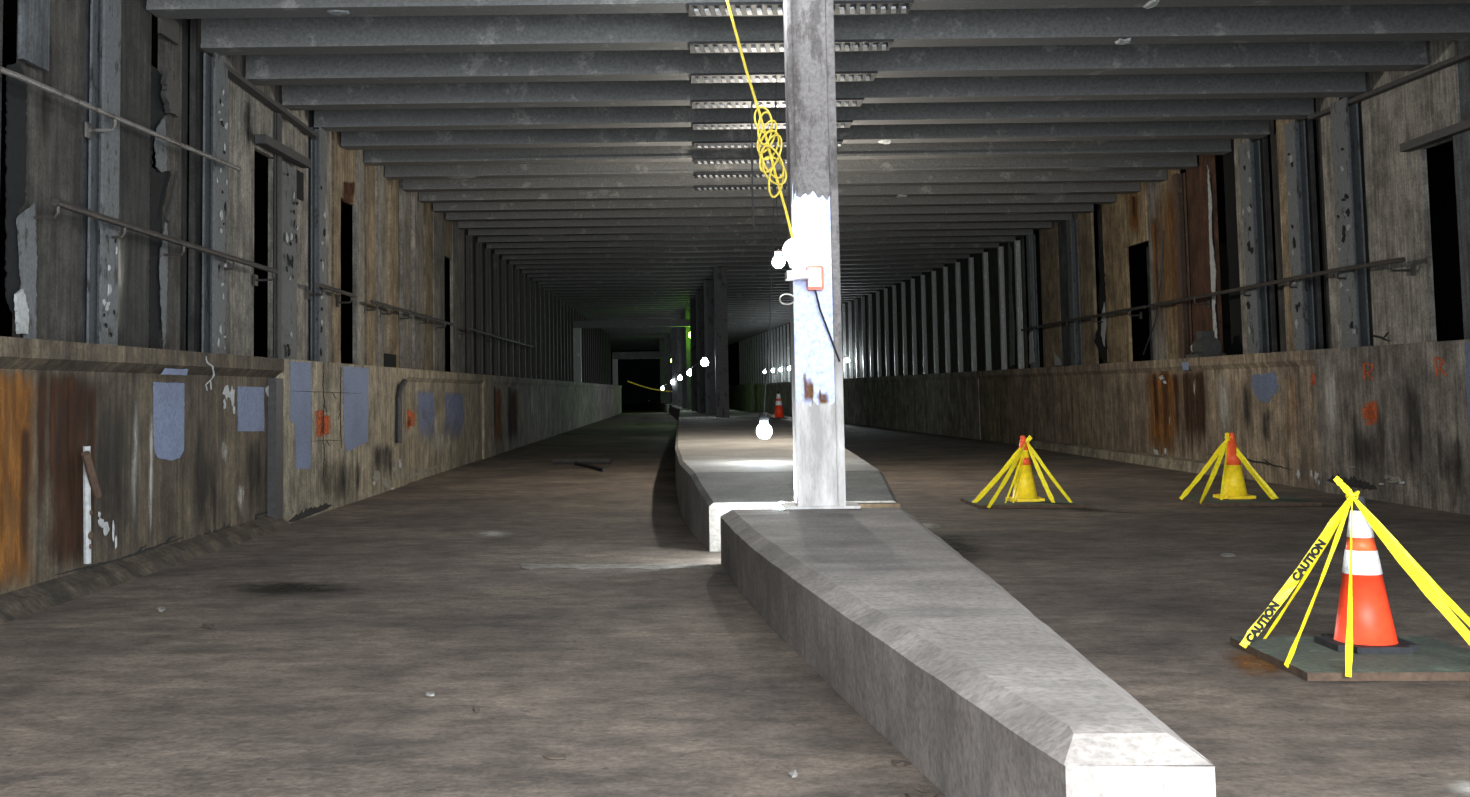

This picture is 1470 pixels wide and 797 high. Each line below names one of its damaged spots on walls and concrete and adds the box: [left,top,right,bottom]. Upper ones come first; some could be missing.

peeling [16,203,38,339]
rust [1149,372,1205,448]